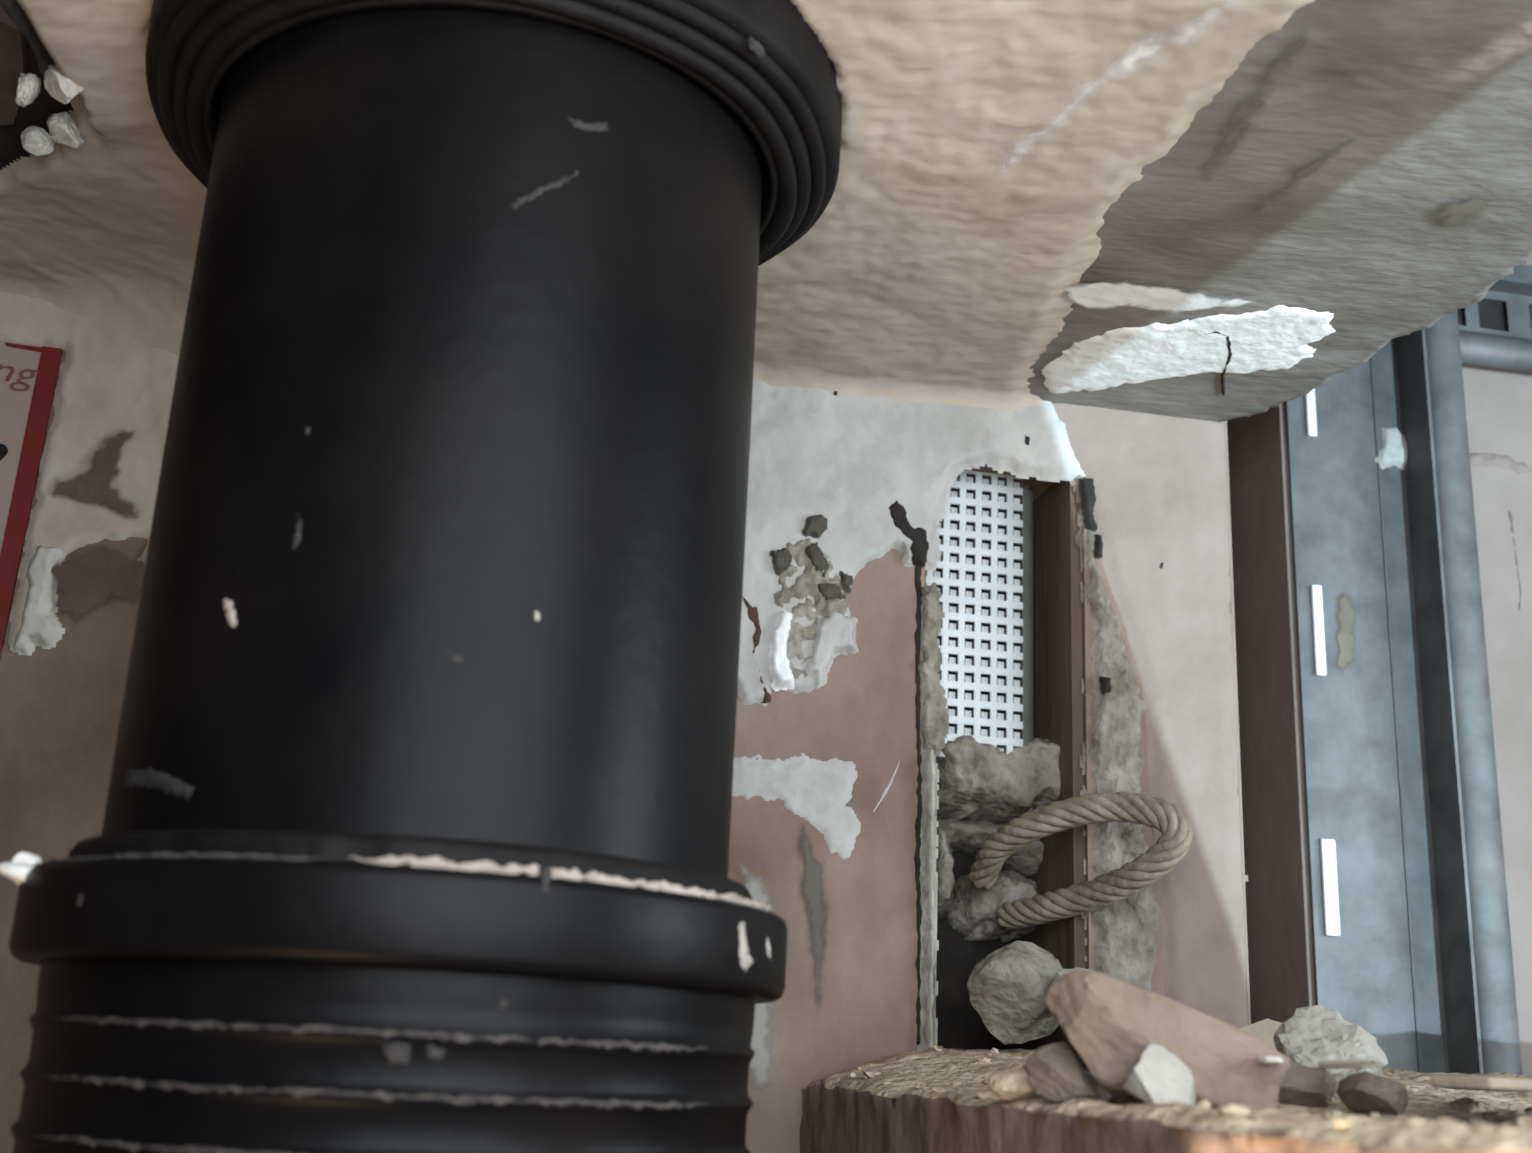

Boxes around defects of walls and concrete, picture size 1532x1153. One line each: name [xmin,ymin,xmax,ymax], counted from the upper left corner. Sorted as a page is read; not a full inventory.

peeling [53,431,137,518]
flaking render [10,545,66,656]
spalling [769,514,859,691]
spalling [889,501,949,756]
spalling [1075,478,1146,796]
spalling [1083,822,1149,878]
spalling [1082,885,1161,991]